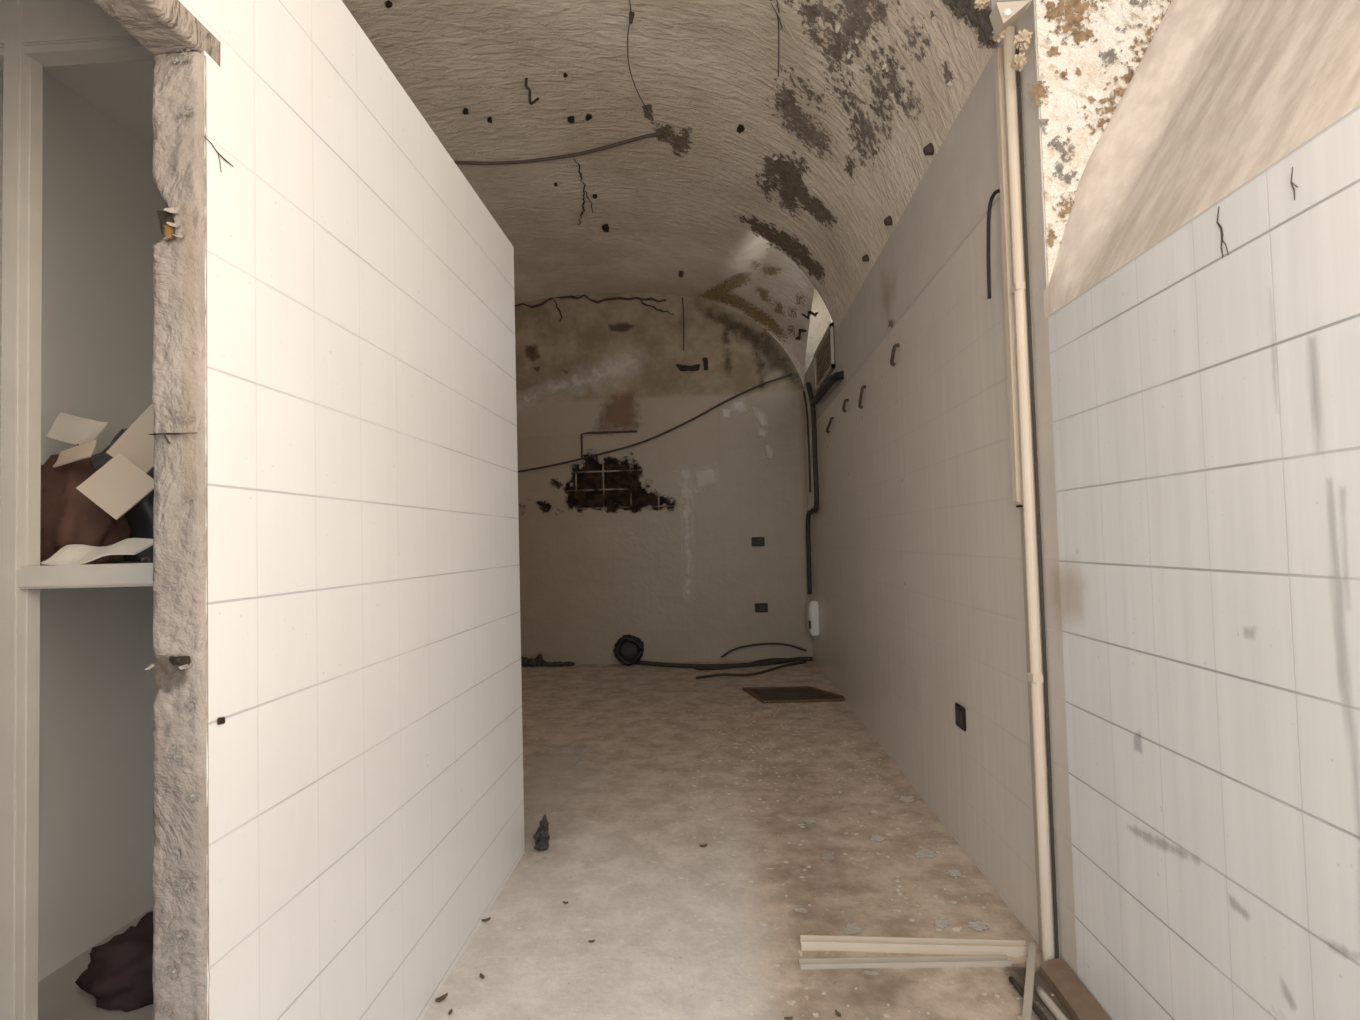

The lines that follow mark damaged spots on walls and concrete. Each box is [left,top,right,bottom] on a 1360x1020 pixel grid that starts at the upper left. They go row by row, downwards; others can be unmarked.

peeling [736,0,997,284]
damp [609,323,634,332]
damp [697,261,805,387]
flaking render [520,449,677,516]